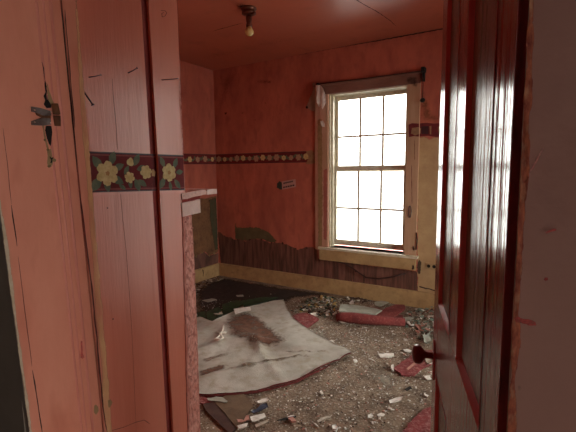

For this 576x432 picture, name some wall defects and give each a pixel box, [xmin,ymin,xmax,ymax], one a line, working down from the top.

peeling [184,119,439,432]